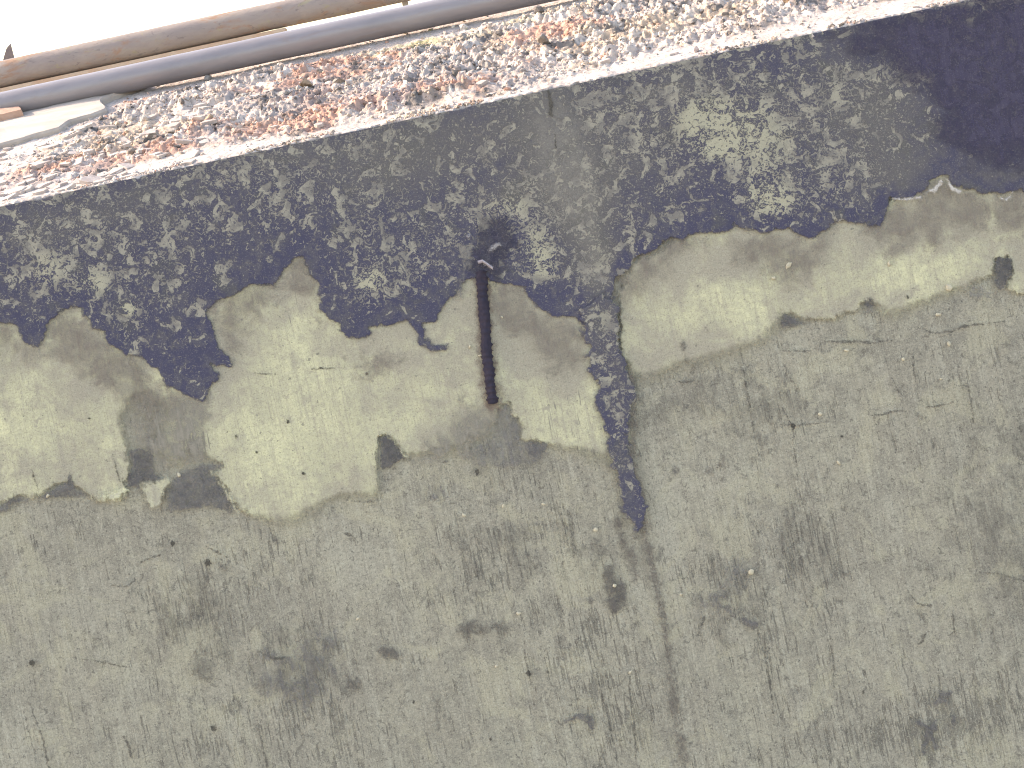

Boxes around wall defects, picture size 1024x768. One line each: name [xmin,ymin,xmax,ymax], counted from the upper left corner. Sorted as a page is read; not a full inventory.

water stain [853,0,1024,165]
peeling [0,220,612,522]
peeling [610,174,1024,379]
water stain [493,288,688,761]